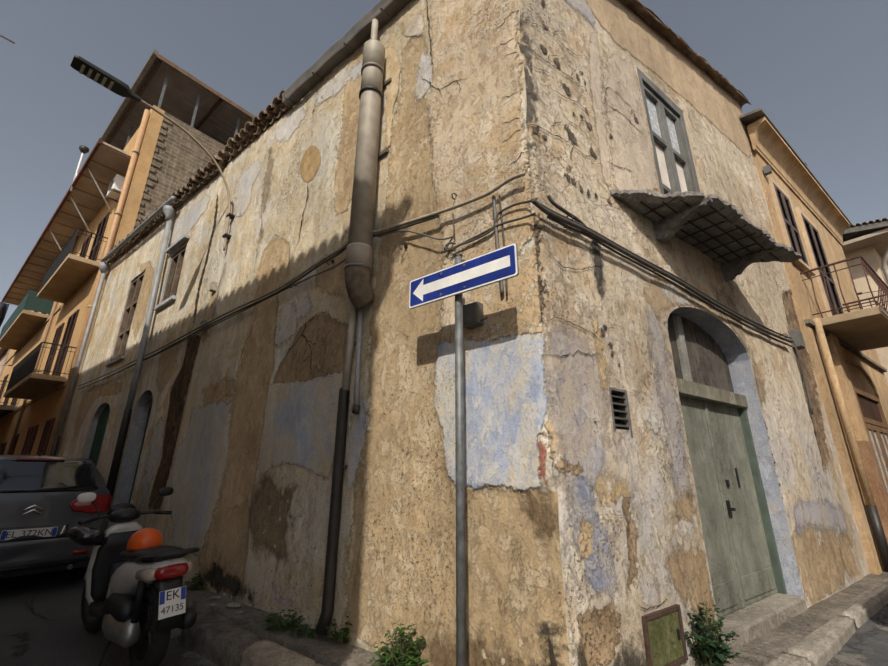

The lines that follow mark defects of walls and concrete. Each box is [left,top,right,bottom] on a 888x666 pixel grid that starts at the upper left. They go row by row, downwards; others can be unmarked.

peeling [168,194,210,246]
crack [192,194,218,328]
peeling [233,159,262,217]
flaking render [275,49,363,216]
crack [421,1,462,97]
crack [496,12,648,172]
flaking render [564,0,752,205]
spalling [640,197,780,263]
flaking render [341,0,640,666]
crack [545,304,610,357]
peeling [141,418,165,502]
flaking render [170,238,348,597]